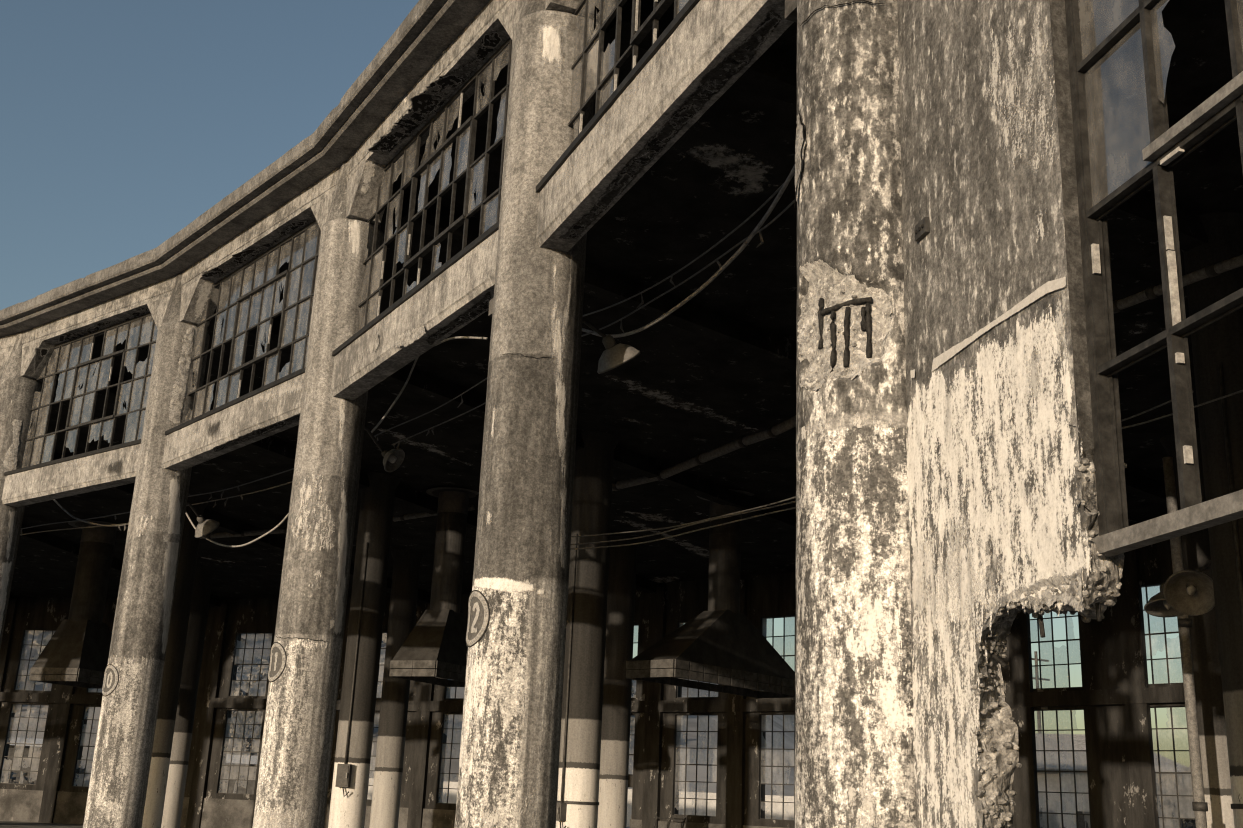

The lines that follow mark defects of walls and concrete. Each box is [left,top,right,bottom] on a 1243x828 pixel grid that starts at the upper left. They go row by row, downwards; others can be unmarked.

peeling [368,32,502,154]
damp [175,422,220,451]
damp [260,382,302,401]
damp [330,398,348,634]
damp [552,265,571,567]
peeling [843,298,1125,828]